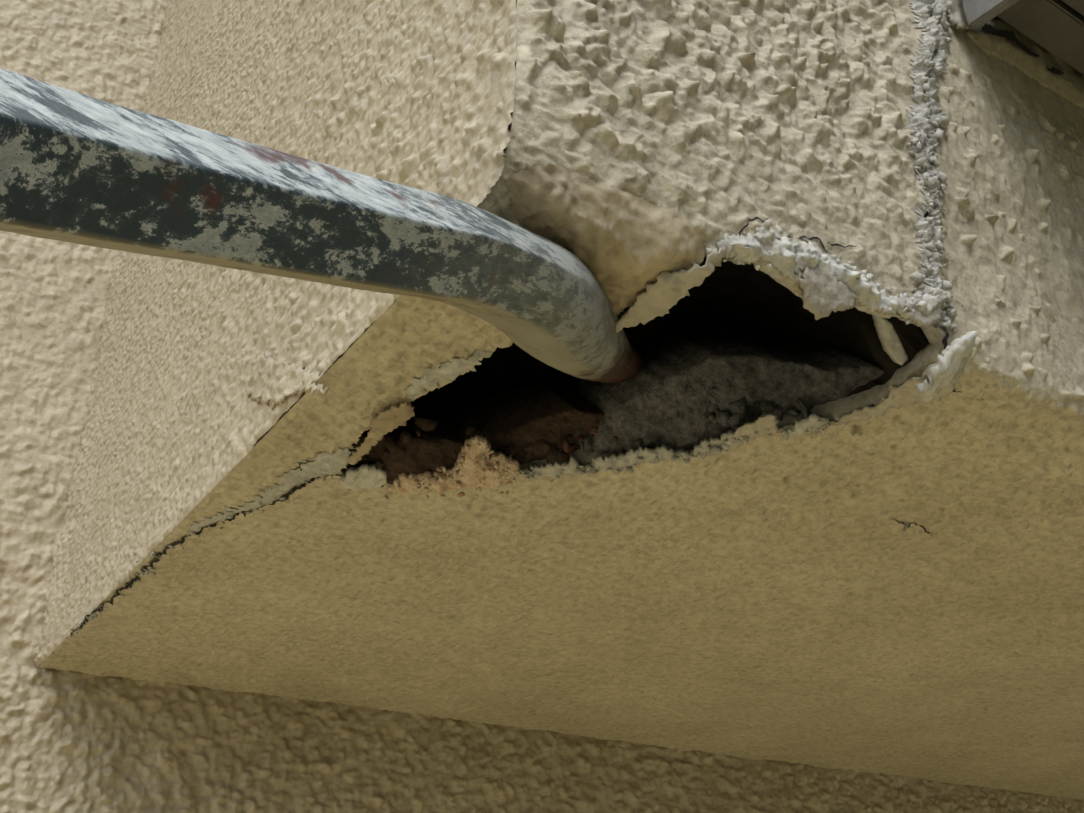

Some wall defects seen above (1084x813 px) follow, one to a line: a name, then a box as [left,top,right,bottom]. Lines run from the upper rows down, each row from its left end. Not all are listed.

crack [904,0,963,350]
spalling [190,219,978,532]
crack [66,460,346,643]